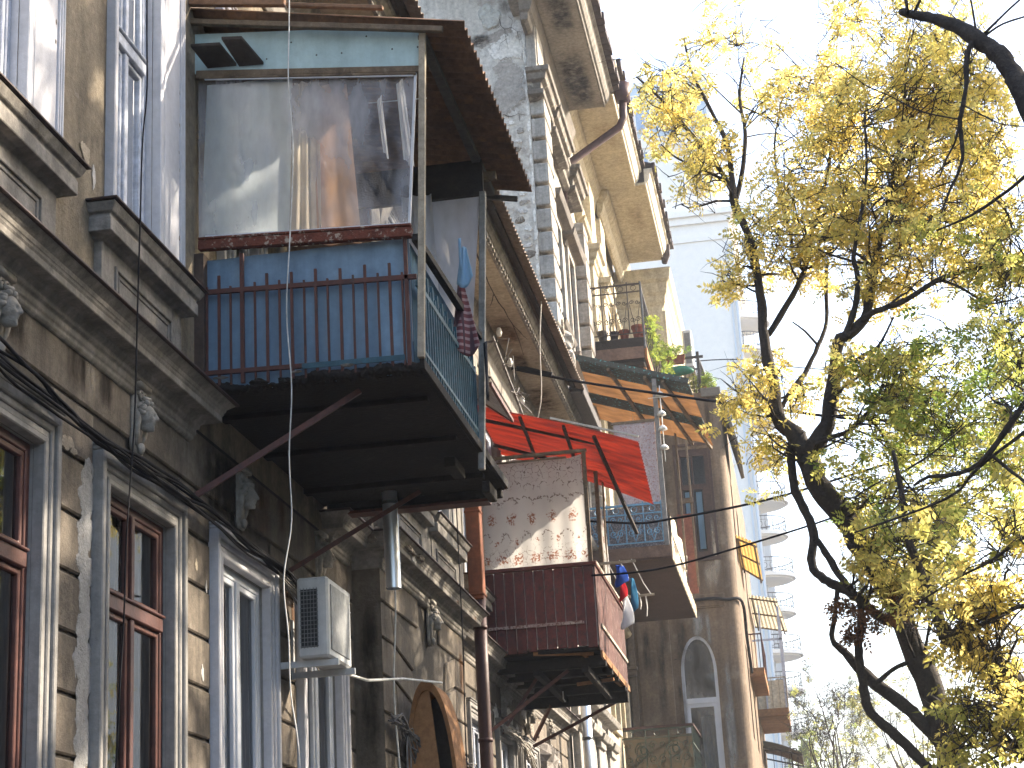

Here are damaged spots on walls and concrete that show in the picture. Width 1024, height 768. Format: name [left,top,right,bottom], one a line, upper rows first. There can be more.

flaking render [475,20,540,276]
flaking render [62,435,94,768]